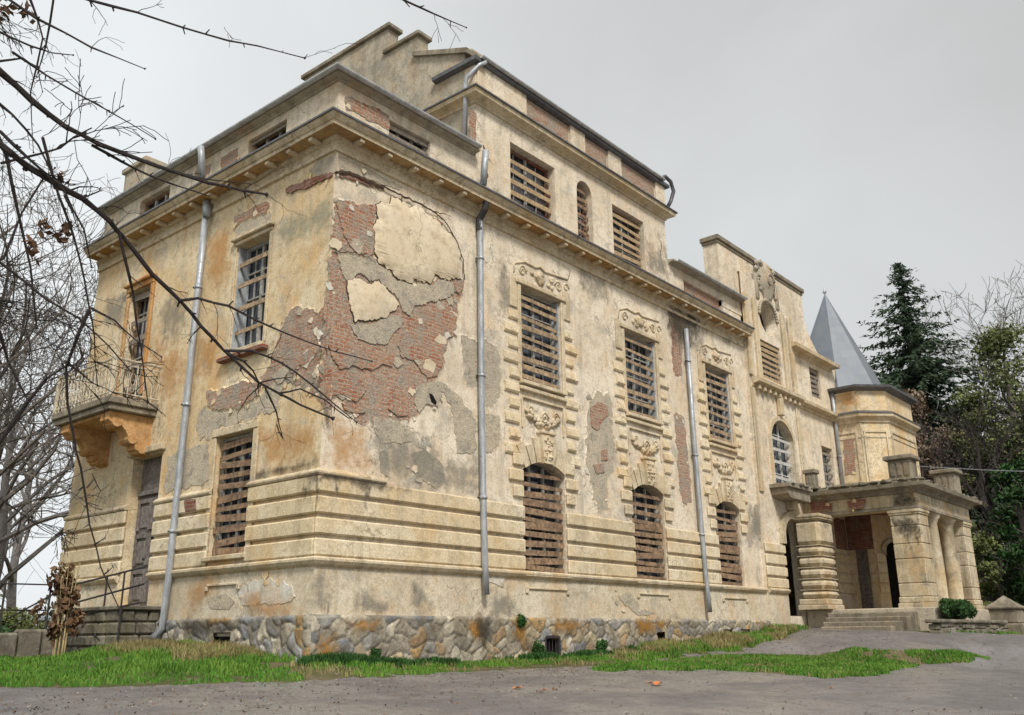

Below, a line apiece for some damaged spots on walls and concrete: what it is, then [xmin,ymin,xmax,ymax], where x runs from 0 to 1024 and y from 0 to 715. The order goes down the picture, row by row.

flaking render [344,95,390,130]
flaking render [285,169,385,194]
spalling [206,198,464,429]
flaking render [668,312,683,376]
damp [377,436,473,488]
spalling [583,389,617,516]
spalling [674,412,692,505]
flaking render [843,439,856,475]